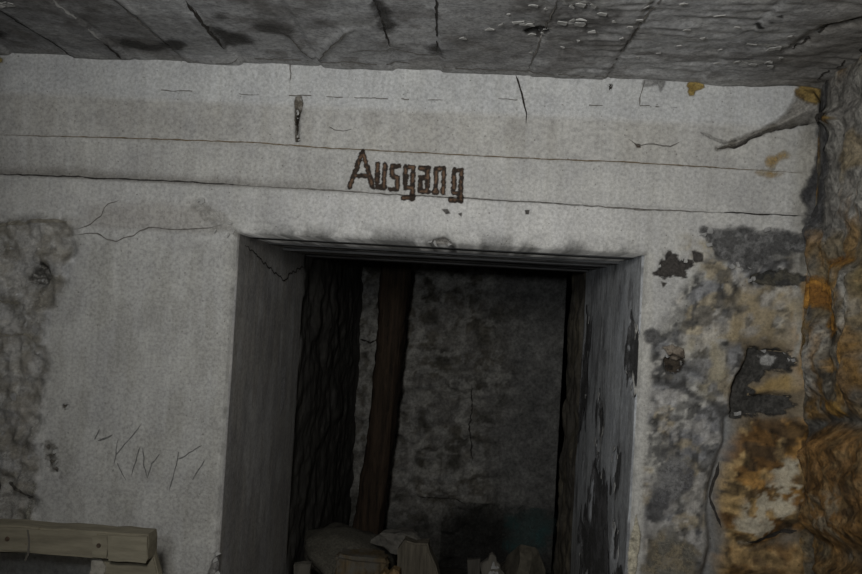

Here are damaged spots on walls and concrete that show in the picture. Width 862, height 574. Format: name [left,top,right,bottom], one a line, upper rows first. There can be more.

crack [186,0,660,120]
crack [78,201,219,242]
peeling [652,227,807,288]
peeling [729,346,797,419]
peeling [577,305,641,574]